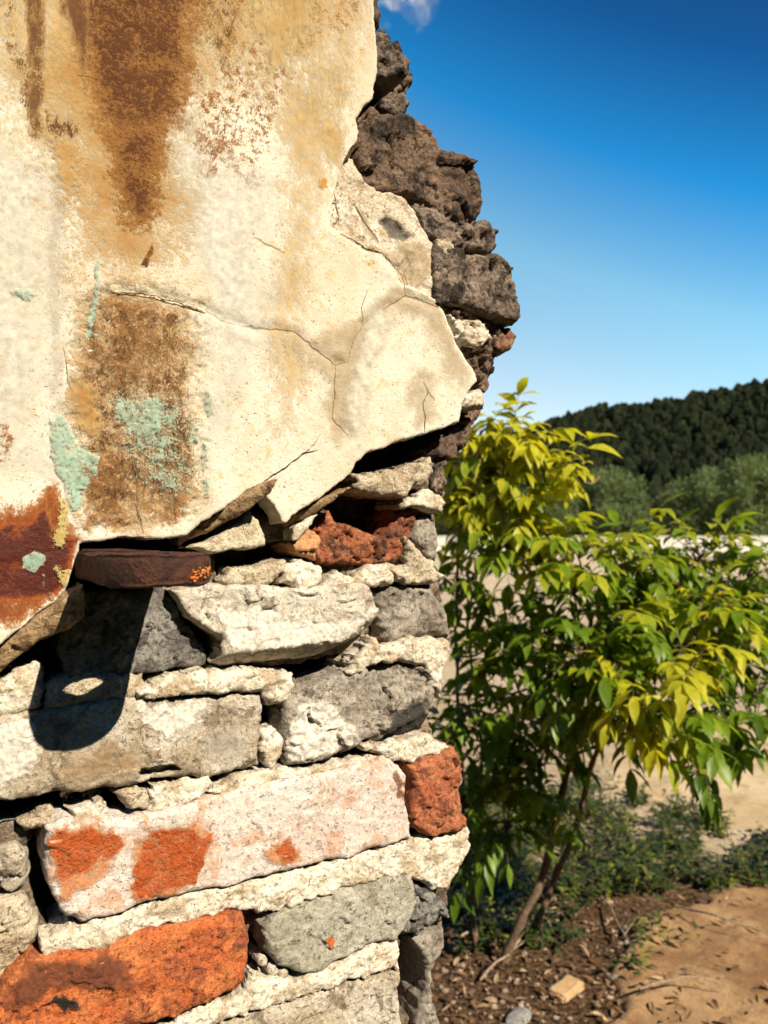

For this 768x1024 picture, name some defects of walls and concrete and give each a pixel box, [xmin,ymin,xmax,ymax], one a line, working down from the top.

corrosion [0,0,368,301]
corrosion [0,423,15,461]
corrosion [0,483,81,629]
crack [205,250,439,481]